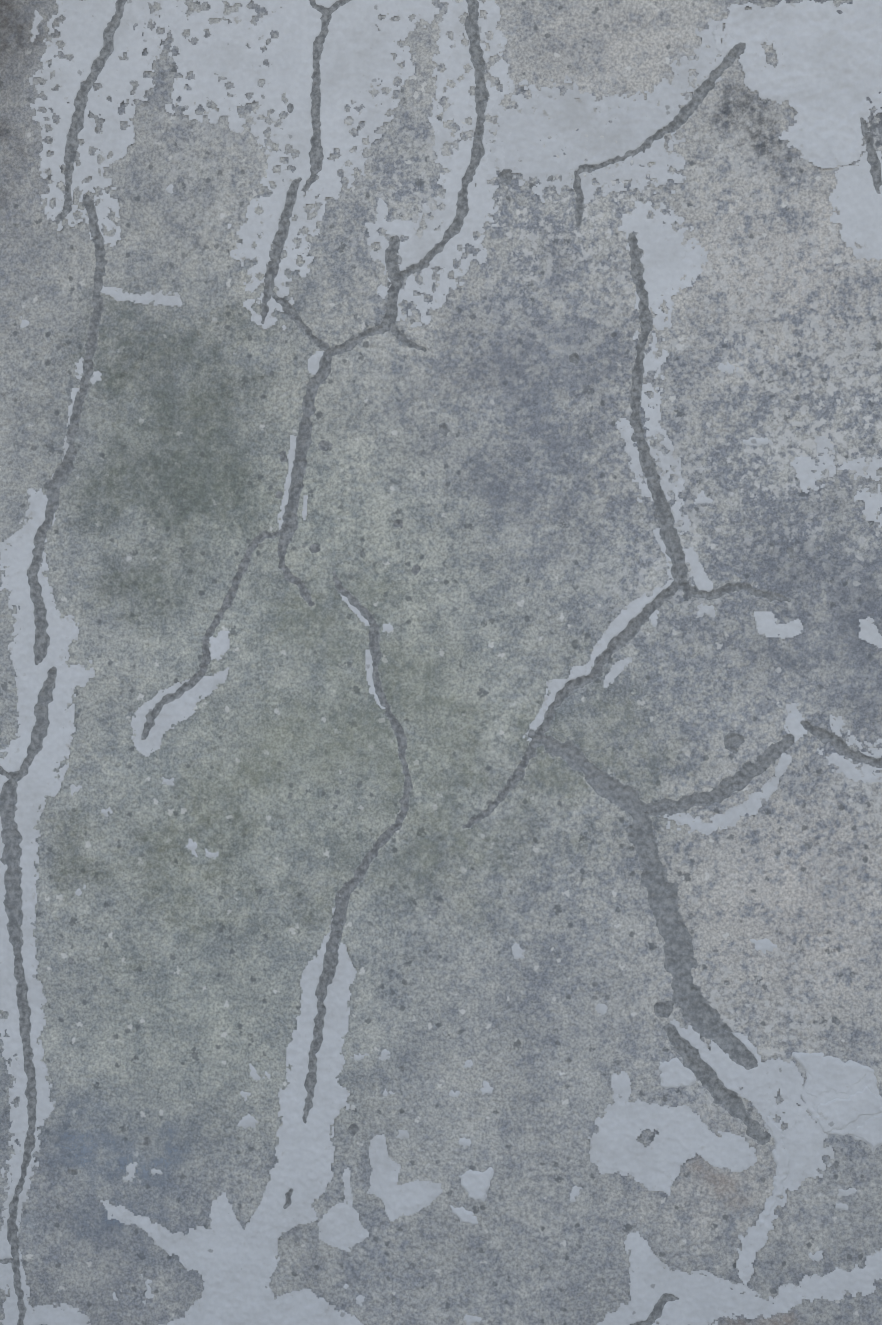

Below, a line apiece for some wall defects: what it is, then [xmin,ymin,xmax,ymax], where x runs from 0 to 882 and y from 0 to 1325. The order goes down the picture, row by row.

crack [573,42,746,228]
crack [860,117,882,194]
peeling [0,357,102,1325]
crack [0,0,127,1325]
peeling [185,838,218,859]
peeling [100,893,494,1325]
crack [141,0,490,1123]
peeling [29,0,882,757]
peeling [511,943,525,959]
crack [630,1293,679,1325]
crack [462,233,882,1145]
peeling [588,1000,882,1325]